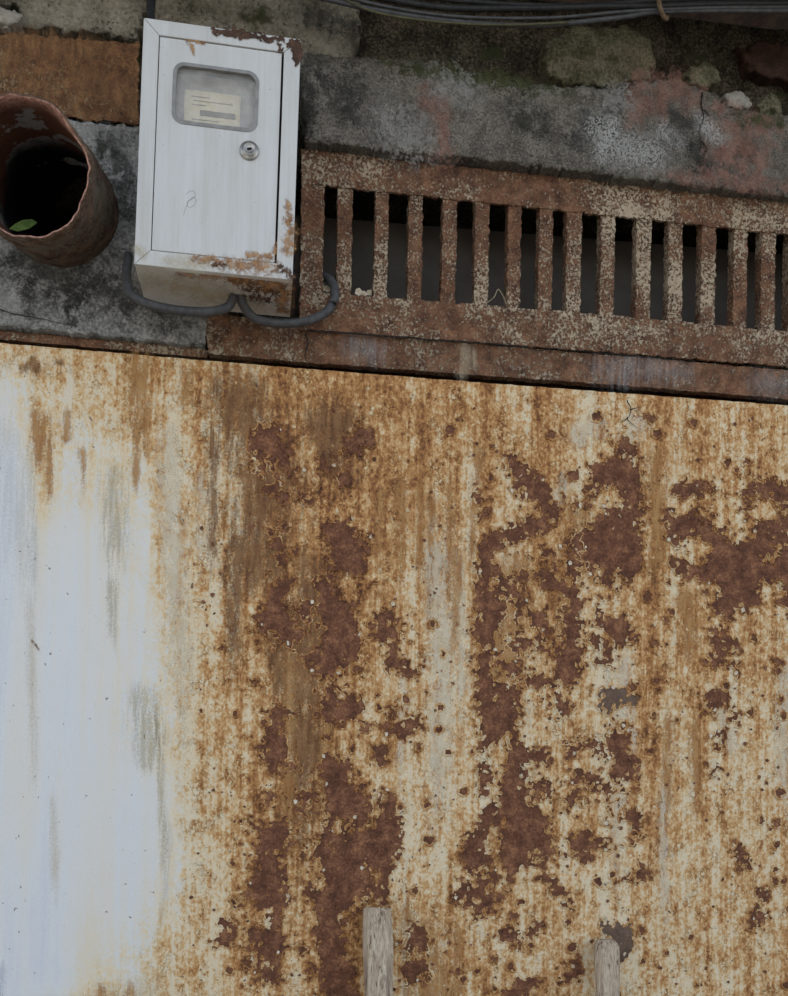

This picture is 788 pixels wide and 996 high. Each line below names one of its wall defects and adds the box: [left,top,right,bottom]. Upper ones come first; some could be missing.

crack [697,92,709,163]
water stain [0,251,137,327]
rust [178,200,297,314]
rust [181,369,306,671]
rust [305,394,376,483]
rust [371,478,494,673]
rust [472,442,482,485]
rust [470,553,532,700]
rust [649,716,734,834]
rust [391,884,489,996]